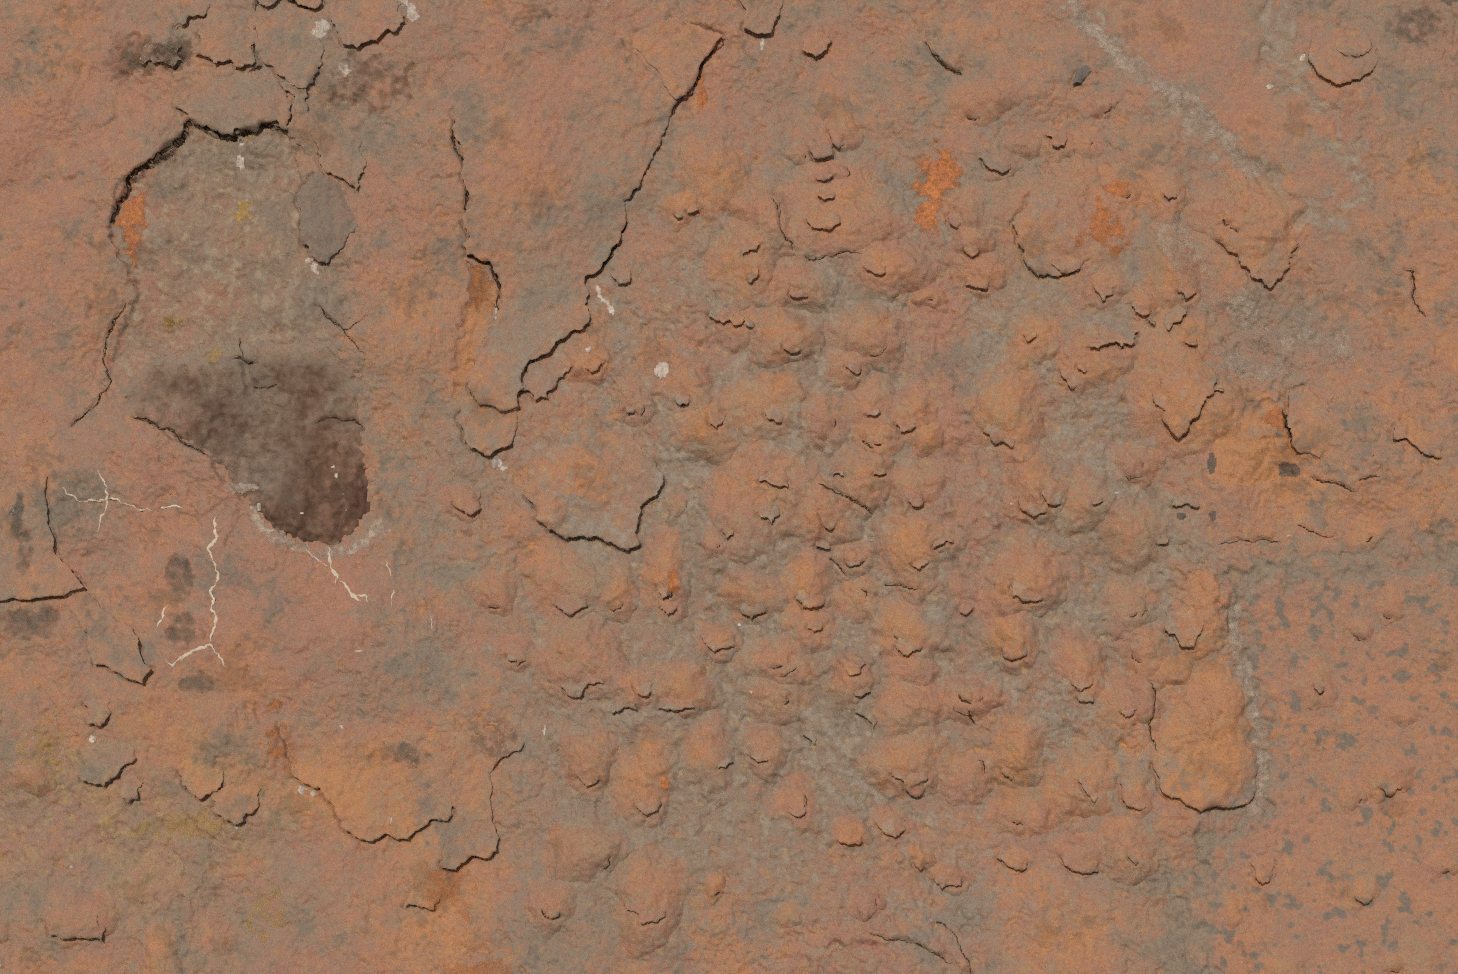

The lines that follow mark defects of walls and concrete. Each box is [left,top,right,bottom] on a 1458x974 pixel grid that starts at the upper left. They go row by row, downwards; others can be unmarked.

peeling [740,0,783,34]
corrosion [114,193,148,266]
spalling [103,0,405,546]
peeling [450,11,724,456]
corrosion [912,139,963,233]
peeling [1151,749,1258,812]